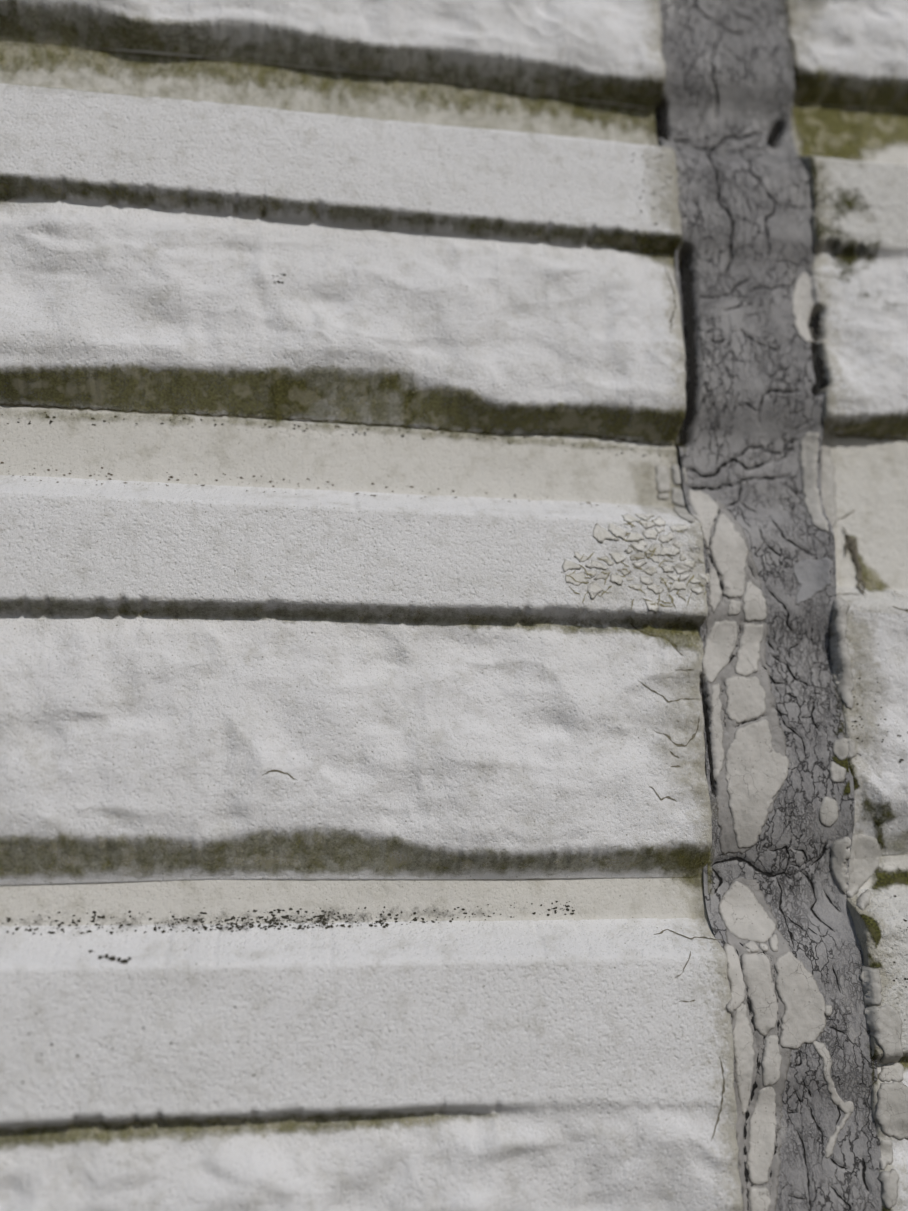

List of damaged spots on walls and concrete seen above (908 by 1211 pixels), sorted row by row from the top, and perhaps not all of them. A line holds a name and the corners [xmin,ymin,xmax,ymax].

water stain [797,95,861,239]
peeling [792,272,822,343]
crack [0,0,908,801]
water stain [262,368,685,457]
peeling [799,432,838,533]
peeling [793,557,854,710]
water stain [89,950,132,964]
water stain [1,904,515,935]
water stain [649,848,710,888]
crack [654,844,869,1211]
peeling [718,878,832,1211]
peeling [859,966,908,1209]